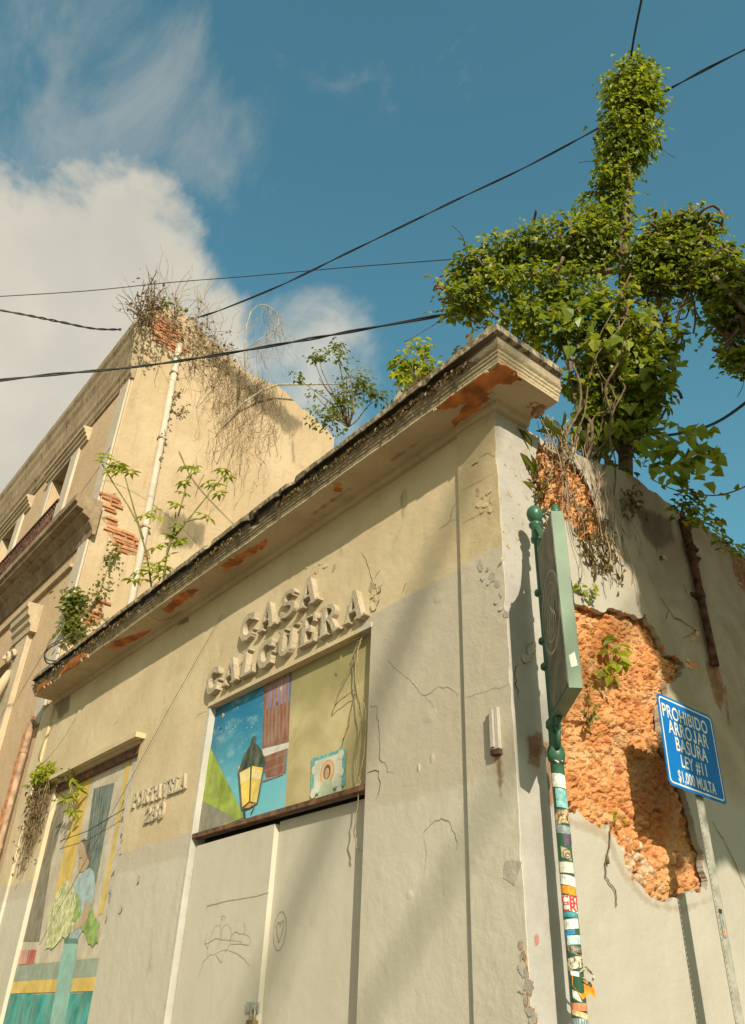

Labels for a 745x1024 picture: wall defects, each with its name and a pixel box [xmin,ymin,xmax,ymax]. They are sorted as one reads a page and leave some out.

spalling [433,364,523,428]
flaking render [99,491,151,560]
spalling [217,539,267,572]
spalling [504,447,602,542]
rust [680,516,701,563]
spalling [159,589,199,613]
spalling [108,628,152,649]
crack [389,661,519,713]
spalling [561,606,704,902]
peeling [518,941,538,1024]